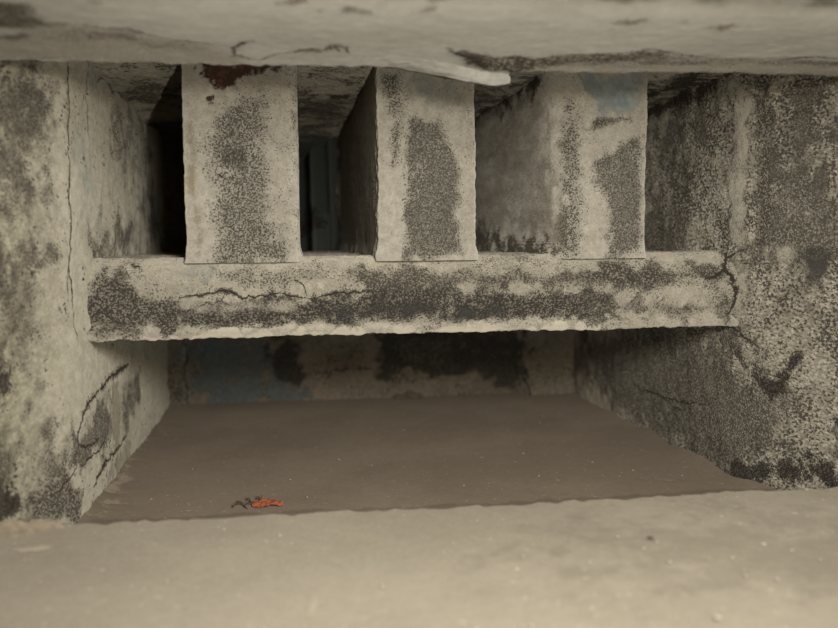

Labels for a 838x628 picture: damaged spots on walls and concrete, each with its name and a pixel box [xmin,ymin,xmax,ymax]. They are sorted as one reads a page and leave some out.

leakage [0,1,64,40]
crack [51,23,351,61]
leakage [0,60,70,409]
crack [67,63,115,342]
crack [179,279,402,307]
leakage [87,65,838,489]
crack [704,245,761,349]
crack [55,364,129,494]